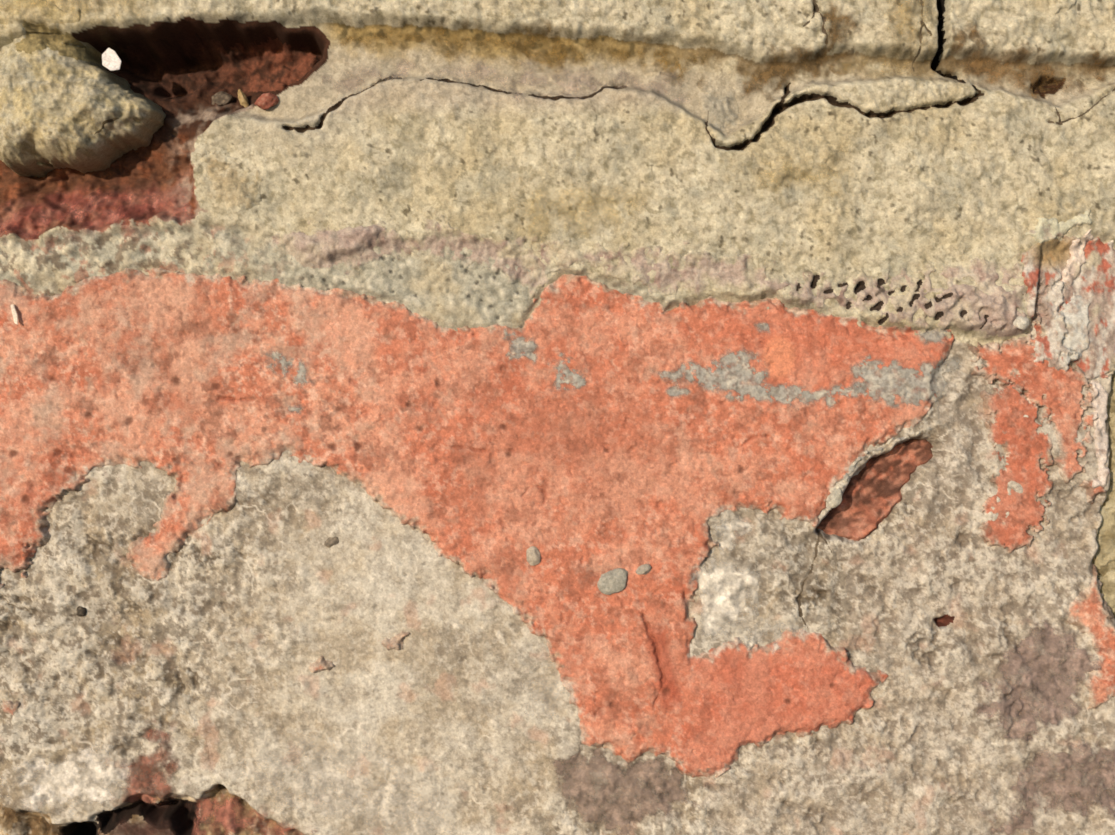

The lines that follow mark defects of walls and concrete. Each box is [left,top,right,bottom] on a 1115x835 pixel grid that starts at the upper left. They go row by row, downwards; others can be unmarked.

peeling [102,48,121,71]
crack [803,0,828,45]
crack [912,0,932,72]
crack [282,76,627,133]
crack [705,80,984,151]
spalling [0,209,1115,835]